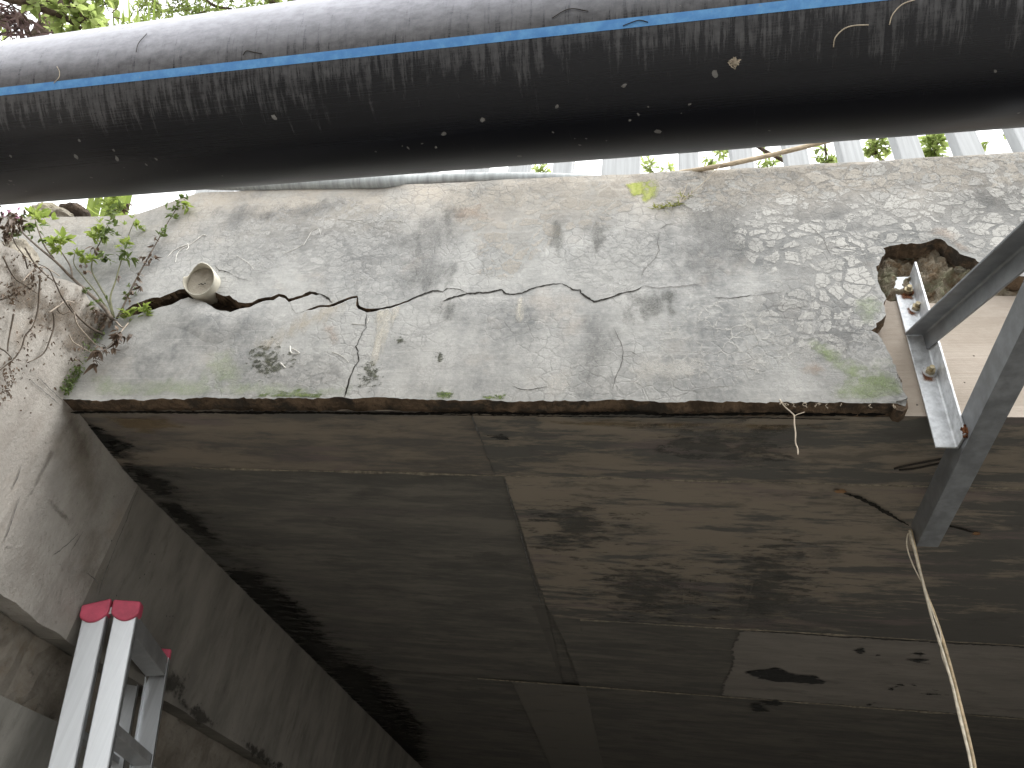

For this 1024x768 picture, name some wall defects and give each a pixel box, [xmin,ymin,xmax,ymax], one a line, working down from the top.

crack [31,153,1024,420]
spalling [877,249,971,303]
spalling [995,288,1019,296]
damp [244,337,296,381]
damp [526,501,640,561]
damp [88,424,429,768]
damp [579,532,829,623]